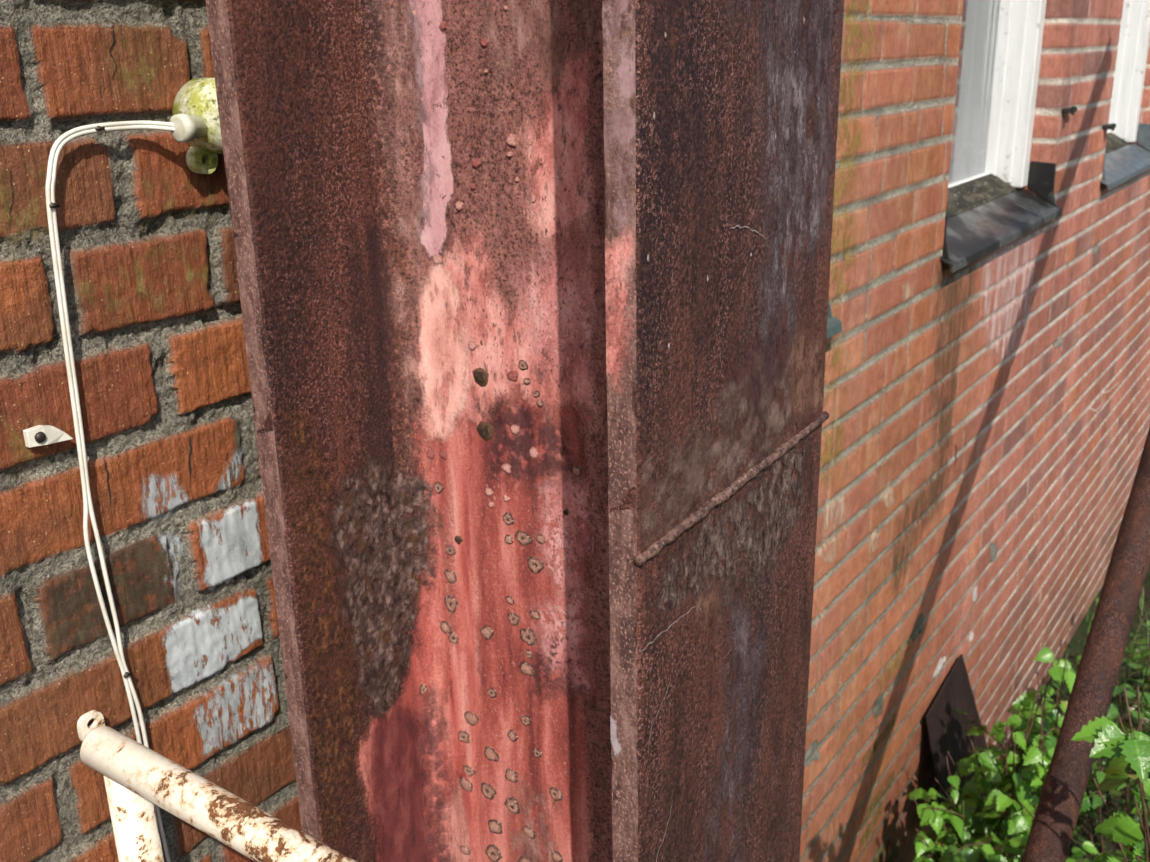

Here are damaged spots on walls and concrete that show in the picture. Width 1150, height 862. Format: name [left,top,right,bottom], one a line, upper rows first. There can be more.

spalling [216,419,244,493]
rust [206,0,320,841]
rust [472,368,489,387]
peeling [357,0,635,862]
rust [602,0,824,862]
peeling [143,475,188,598]
peeling [163,593,276,754]
peeling [198,499,262,590]
rust [331,460,463,717]
rust [505,596,541,676]
rust [485,819,503,862]
rust [459,765,536,839]